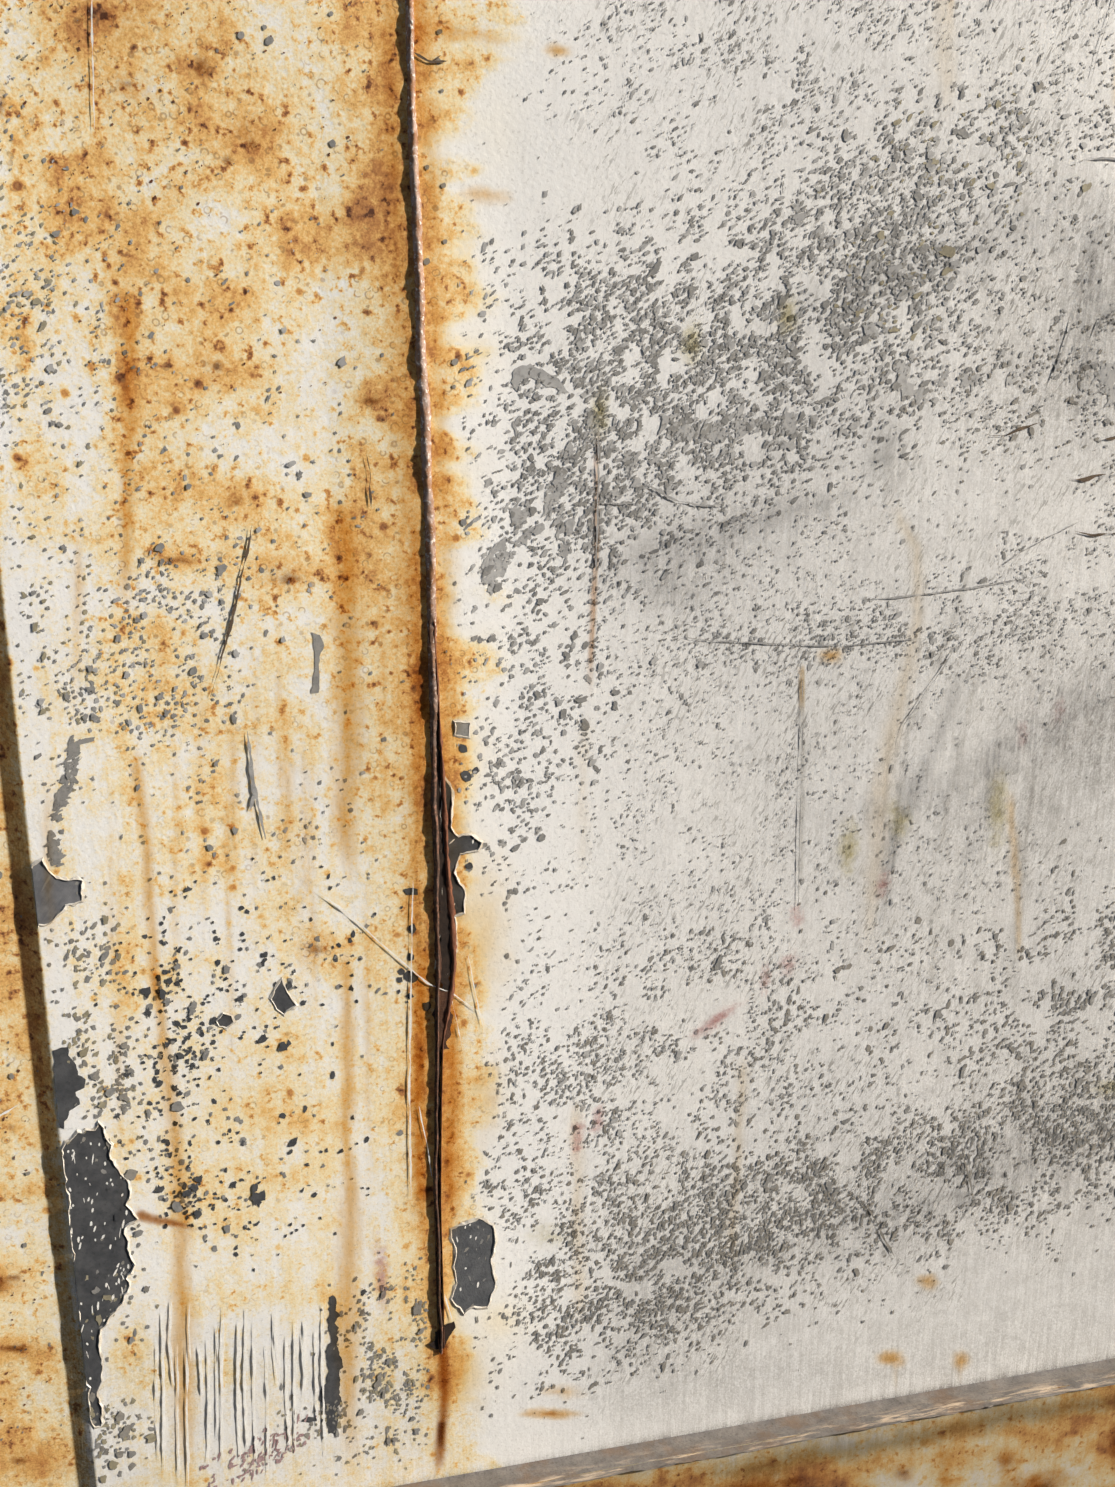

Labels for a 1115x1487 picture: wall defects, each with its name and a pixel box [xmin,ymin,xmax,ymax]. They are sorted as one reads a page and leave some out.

peeling [0,1,431,1487]
rust [439,1348,447,1458]
peeling [434,0,1115,1419]